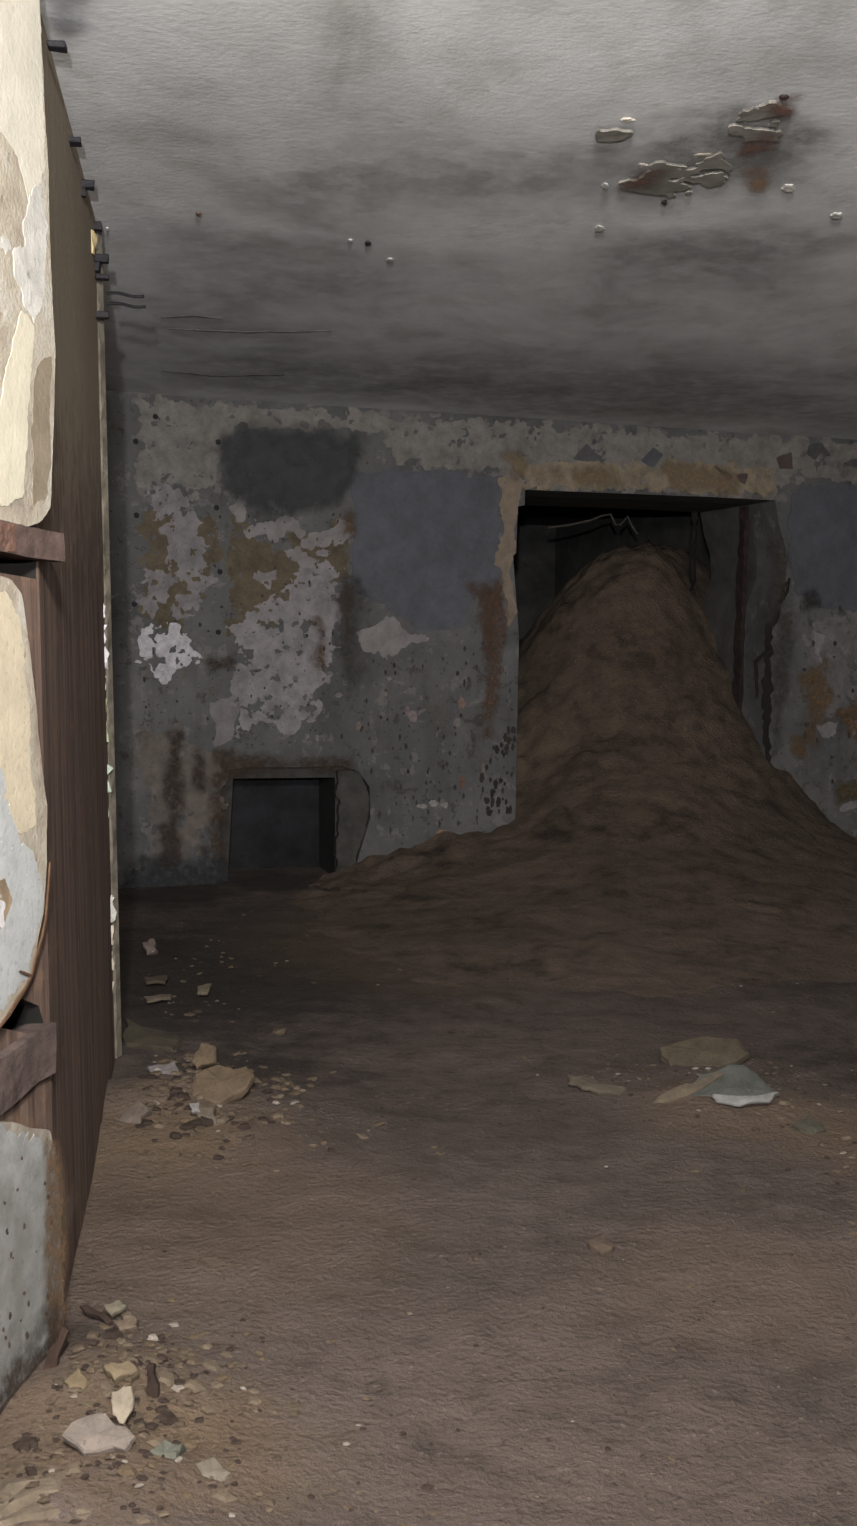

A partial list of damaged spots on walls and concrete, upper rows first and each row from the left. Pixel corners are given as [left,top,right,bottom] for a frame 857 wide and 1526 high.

spalling [595,117,635,141]
spalling [728,94,790,142]
spalling [601,150,733,205]
peeling [0,0,52,506]
flaking render [91,227,109,255]
peeling [107,394,857,872]
corrosion [469,581,506,739]
crack [753,578,791,762]
peeling [0,591,36,834]
peeling [0,878,12,929]
peeling [2,1291,50,1348]